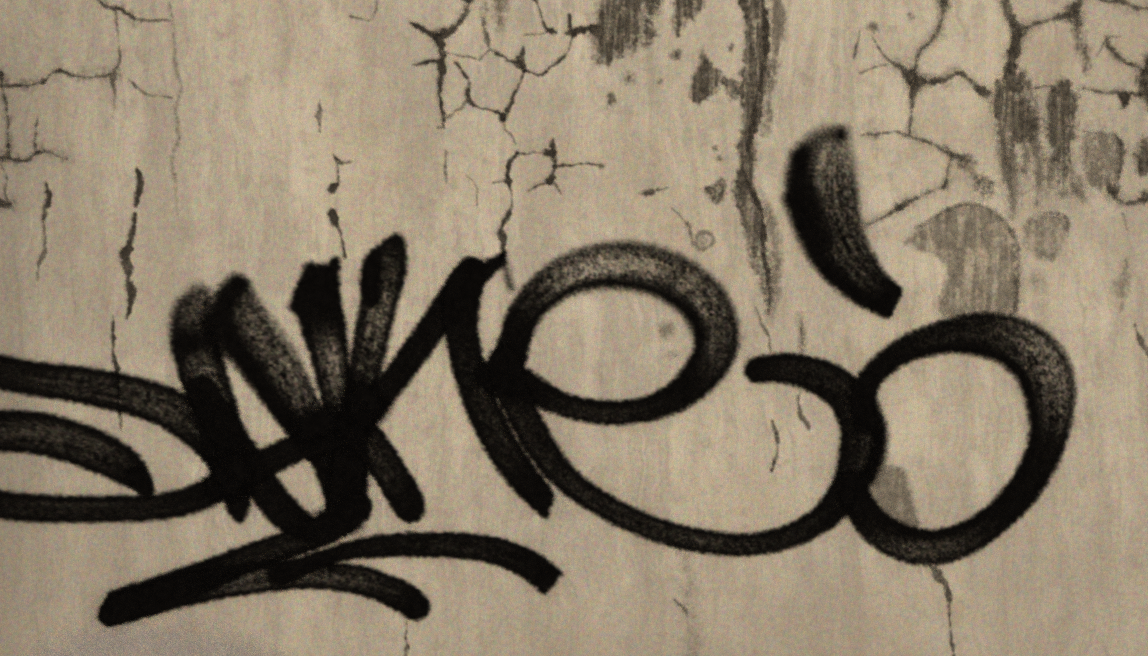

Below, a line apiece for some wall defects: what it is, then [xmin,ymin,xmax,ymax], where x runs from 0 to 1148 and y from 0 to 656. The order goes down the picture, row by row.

crack [0,1,170,278]
crack [111,168,144,373]
crack [410,0,605,258]
crack [853,0,991,225]
crack [1001,0,1148,107]
crack [1107,186,1145,214]